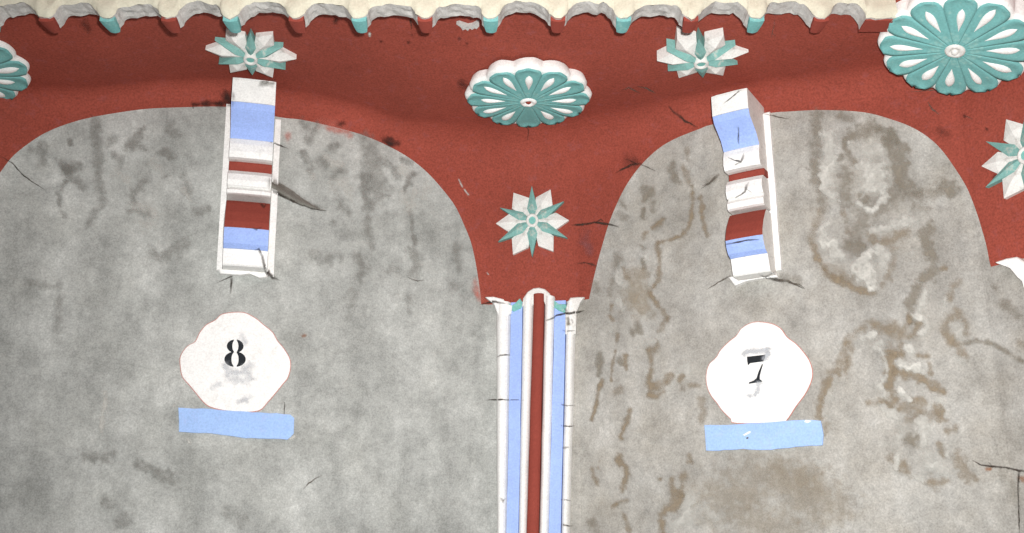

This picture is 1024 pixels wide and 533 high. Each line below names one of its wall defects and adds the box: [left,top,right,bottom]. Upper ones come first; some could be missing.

damp [811,121,921,213]
crack [576,219,617,227]
damp [610,187,706,320]
crack [765,277,802,288]
damp [591,338,628,421]
damp [647,347,690,398]
damp [814,215,948,484]
damp [944,320,1023,362]
damp [613,455,629,506]
damp [659,474,712,533]
crack [976,462,1022,528]